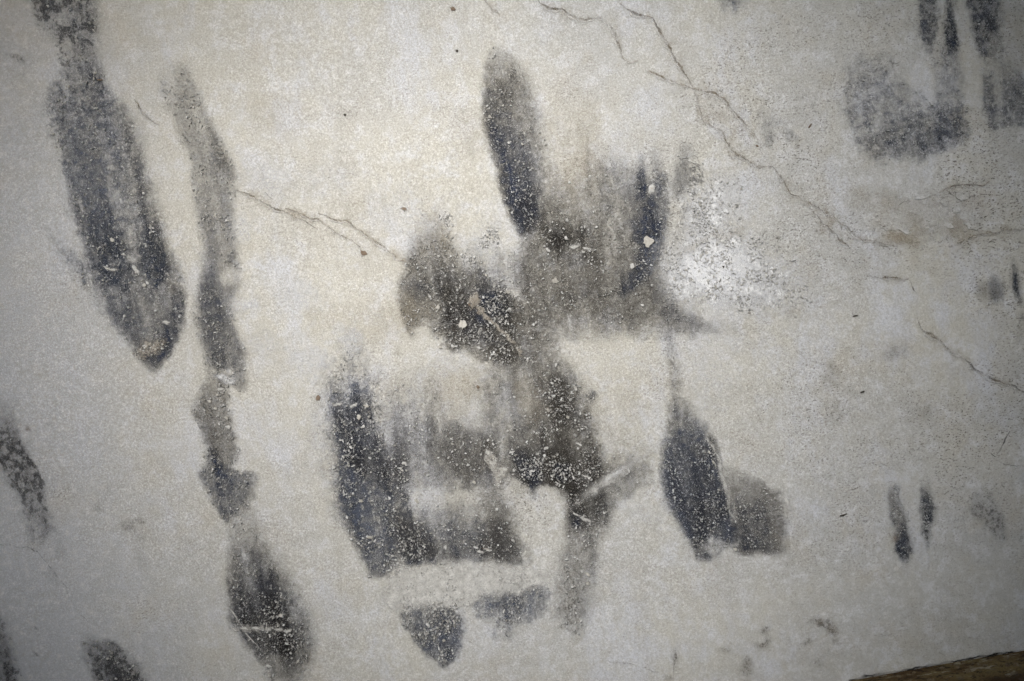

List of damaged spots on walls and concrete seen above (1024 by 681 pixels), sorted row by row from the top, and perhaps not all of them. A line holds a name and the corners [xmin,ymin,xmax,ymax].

crack [620,3,738,117]
leakage [844,60,969,164]
leakage [920,0,958,66]
leakage [967,0,1024,127]
leakage [27,0,313,681]
leakage [322,47,786,636]
leakage [0,412,54,531]
leakage [888,485,934,558]
leakage [401,601,463,665]